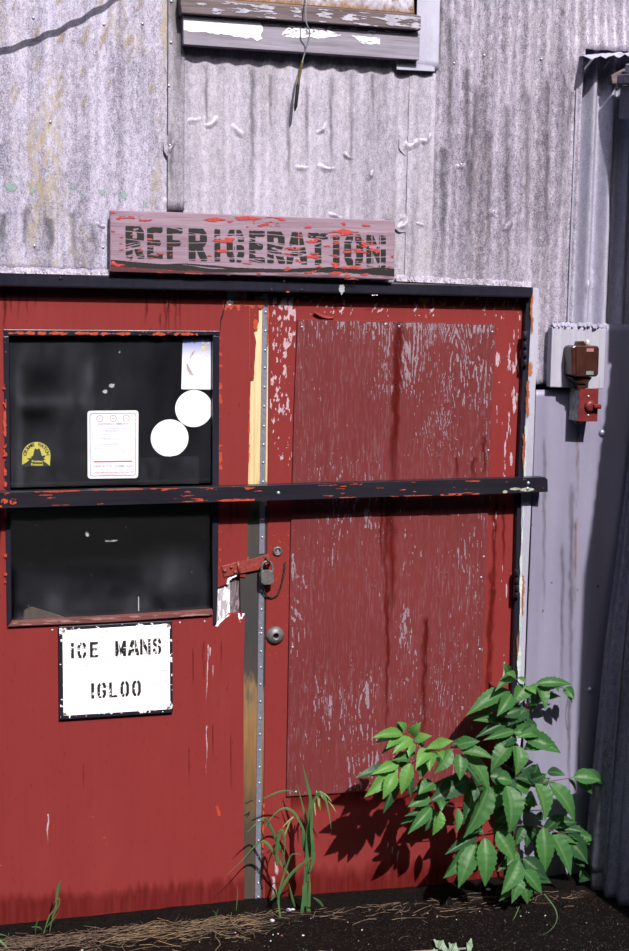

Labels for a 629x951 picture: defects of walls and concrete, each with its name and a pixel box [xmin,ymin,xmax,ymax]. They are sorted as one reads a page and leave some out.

peeling [184,2,421,44]
rust [234,0,414,13]
peeling [111,211,171,269]
peeling [205,216,285,227]
peeling [162,222,523,566]
peeling [503,386,534,493]
spalling [13,615,172,642]
peeling [173,575,244,627]
peeling [269,533,308,657]
peeling [408,512,507,737]
peeling [305,603,420,791]